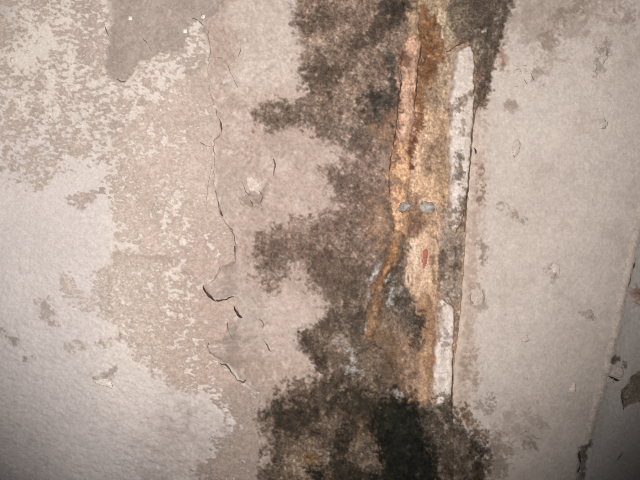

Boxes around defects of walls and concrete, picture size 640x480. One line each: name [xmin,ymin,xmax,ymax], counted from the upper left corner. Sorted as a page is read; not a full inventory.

crack [193,14,241,82]
rust [407,5,444,170]
damp [447,0,515,108]
peeling [0,0,263,480]
crack [200,82,236,263]
damp [252,0,493,480]
rust [361,188,406,342]
crack [464,113,477,232]